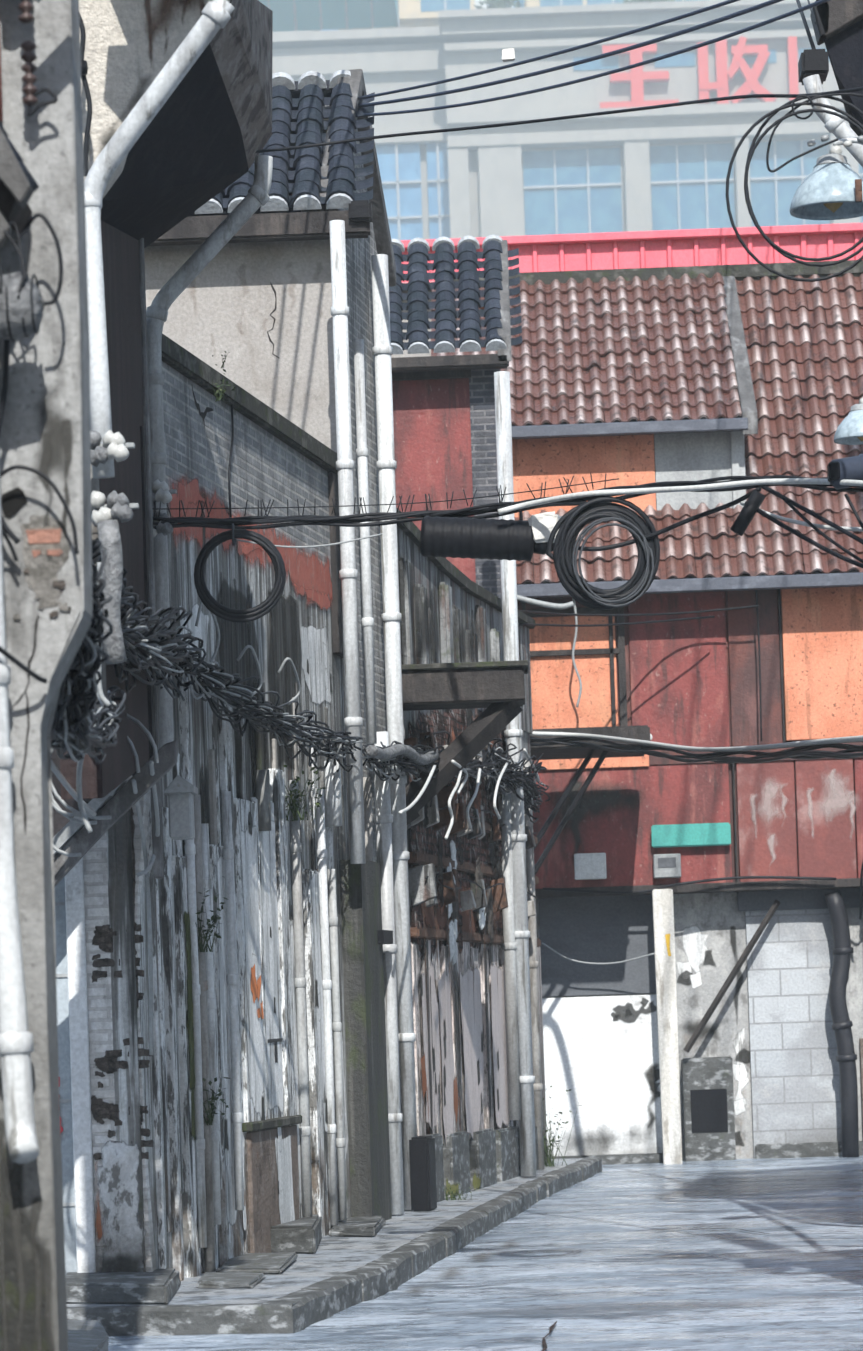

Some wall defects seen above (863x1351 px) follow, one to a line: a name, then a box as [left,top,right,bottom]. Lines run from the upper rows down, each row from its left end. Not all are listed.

damp [145,0,205,59]
crack [267,282,279,358]
flaking render [1,487,71,617]
peeling [169,478,333,609]
peeling [180,604,209,664]
peeling [301,626,332,704]
flaking render [408,708,478,783]
damp [200,767,223,844]
peeling [808,771,856,819]
flaking render [410,727,510,1147]
peeling [676,925,716,989]
crack [542,1321,557,1351]